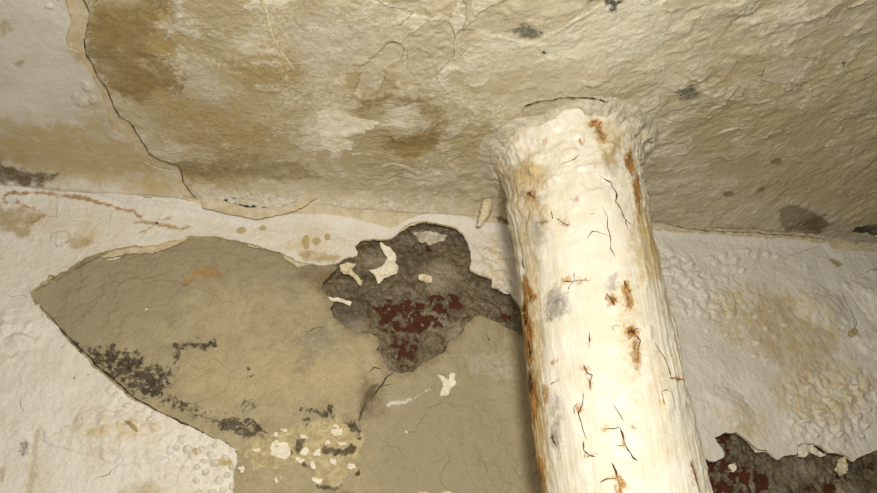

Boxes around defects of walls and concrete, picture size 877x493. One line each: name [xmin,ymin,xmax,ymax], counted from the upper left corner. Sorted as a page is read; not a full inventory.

leakage [88,0,185,101]
crack [375,0,414,92]
crack [83,0,195,197]
rust [588,119,606,142]
leakage [0,166,56,187]
rust [3,191,190,233]
peeling [0,0,542,493]
rust [605,281,633,309]
rust [625,326,641,366]
leakage [71,339,264,439]
leakage [300,404,335,421]
spalling [706,433,877,493]